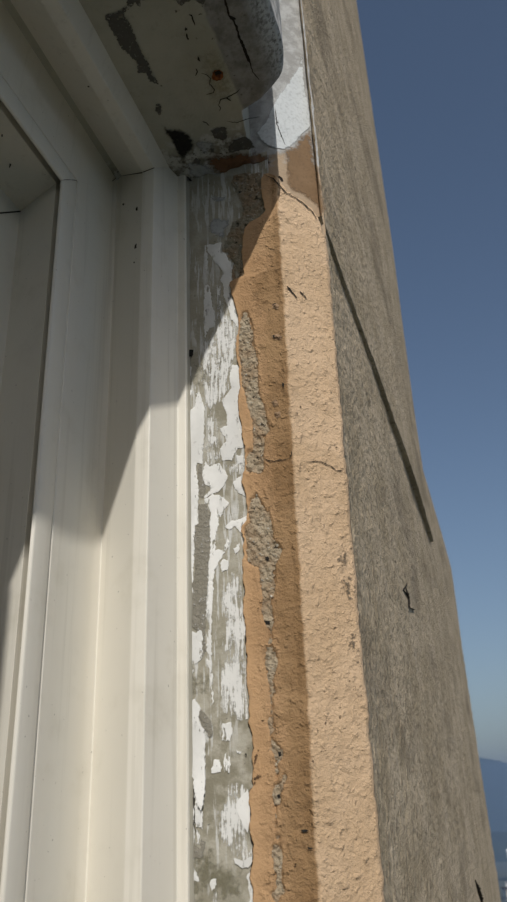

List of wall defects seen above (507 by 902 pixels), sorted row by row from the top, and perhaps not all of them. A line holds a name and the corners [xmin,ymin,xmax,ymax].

peeling [105,0,162,86]
flaking render [210,127,254,153]
crack [185,0,285,144]
flaking render [190,172,287,902]